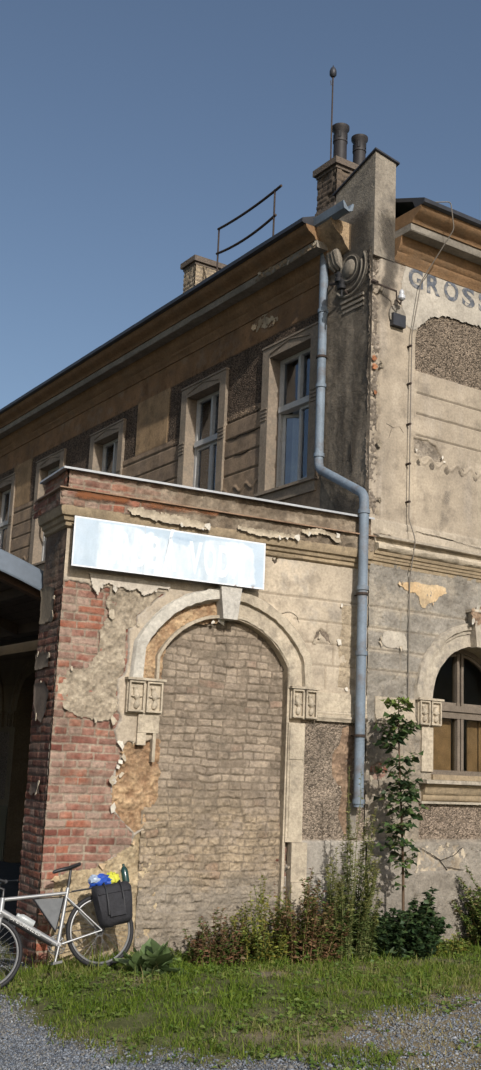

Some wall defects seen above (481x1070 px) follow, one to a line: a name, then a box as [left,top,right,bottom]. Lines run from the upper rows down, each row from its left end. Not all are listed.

peeling [398,581,447,608]
flaking render [143,602,225,679]
flaking render [29,573,171,968]